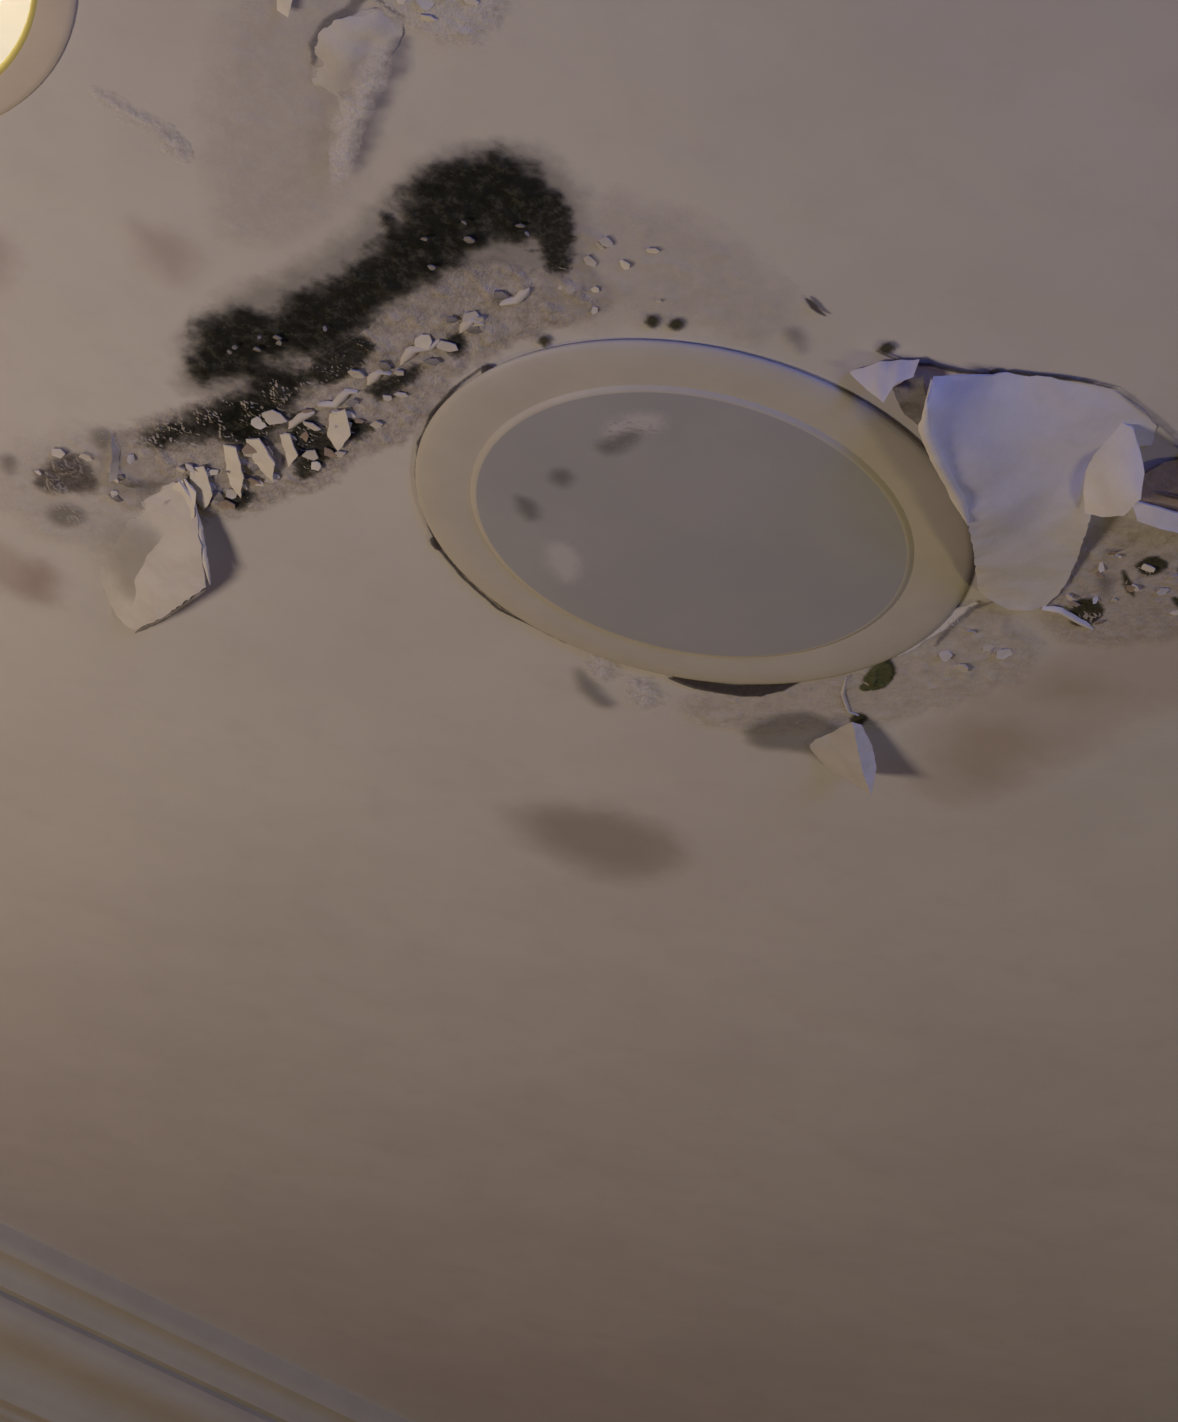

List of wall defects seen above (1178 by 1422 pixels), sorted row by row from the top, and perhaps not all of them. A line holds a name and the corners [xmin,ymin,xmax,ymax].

crack [310,0,393,63]
water stain [226,491,255,510]
flaking render [51,237,630,633]
water stain [146,151,575,479]
peeling [686,359,1178,796]